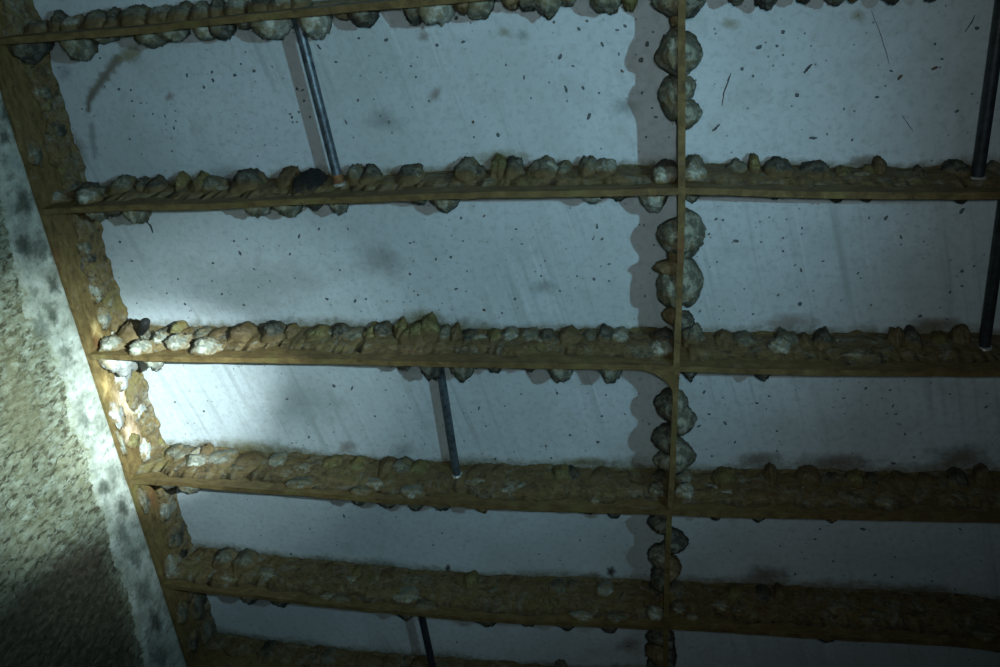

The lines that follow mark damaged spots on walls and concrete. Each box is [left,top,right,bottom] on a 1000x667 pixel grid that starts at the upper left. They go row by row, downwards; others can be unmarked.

leakage [87,56,120,112]